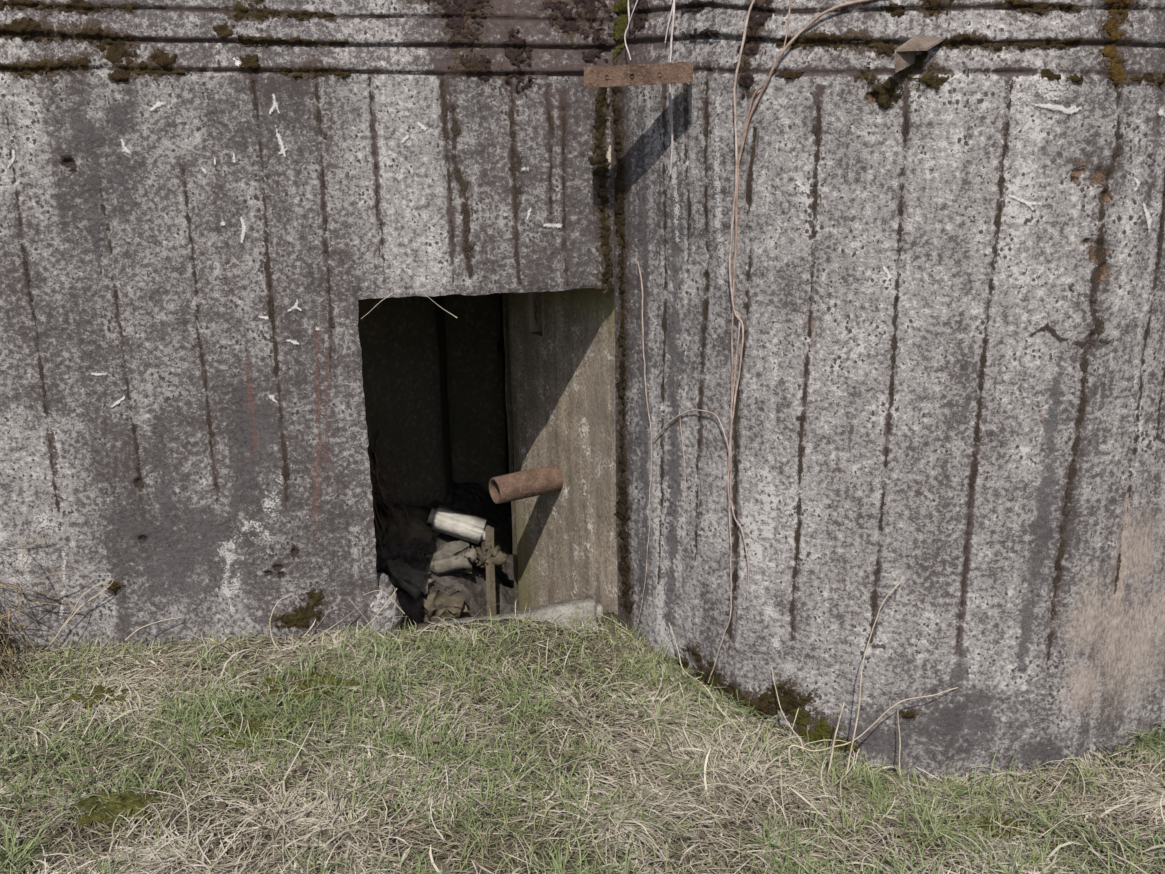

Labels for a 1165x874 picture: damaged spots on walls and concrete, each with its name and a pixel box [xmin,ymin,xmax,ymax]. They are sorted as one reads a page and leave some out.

water stain [60,89,139,274]
crack [1031,47,1165,667]
water stain [0,512,55,592]
water stain [81,379,287,629]
water stain [817,646,1086,776]